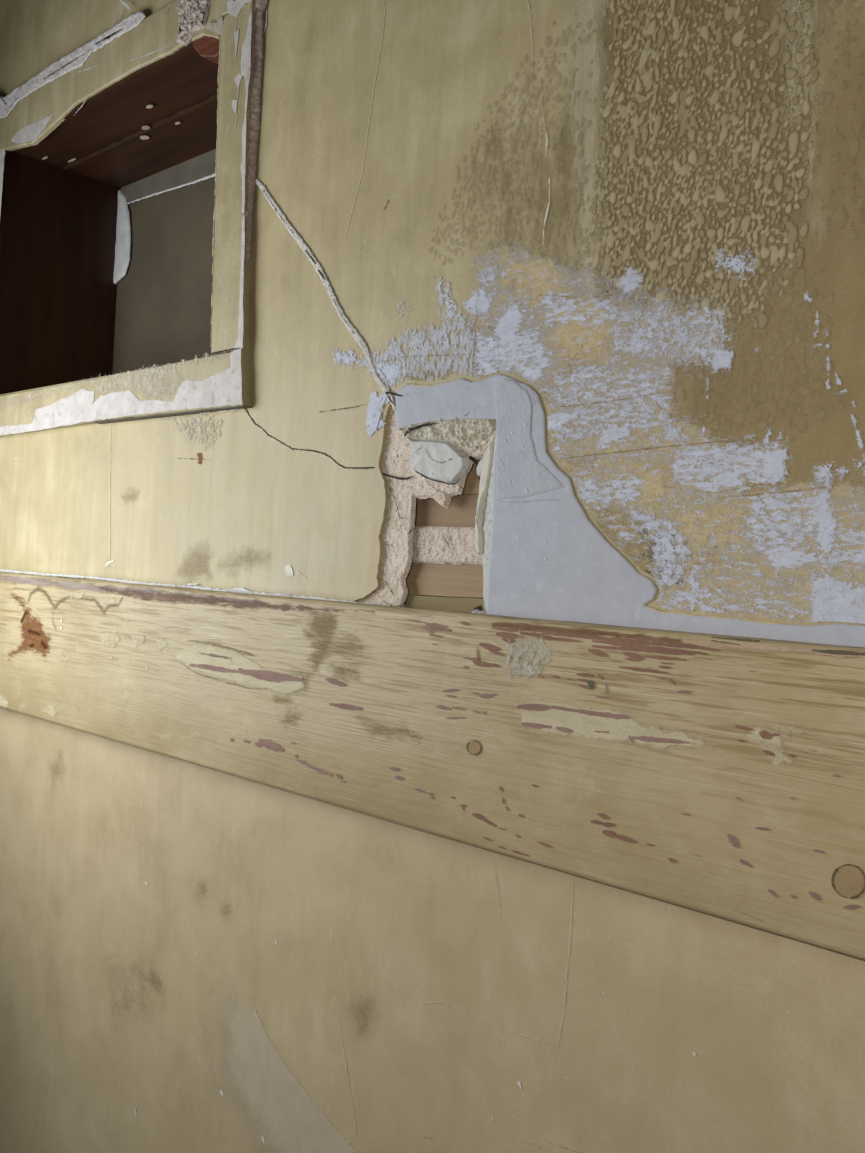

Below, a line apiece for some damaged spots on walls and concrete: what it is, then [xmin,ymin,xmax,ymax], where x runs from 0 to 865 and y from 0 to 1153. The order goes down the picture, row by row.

rust [7,592,52,661]
peeling [0,0,268,452]
crack [245,408,412,480]
crack [256,179,402,413]
peeling [0,234,865,752]
damp [470,0,865,532]